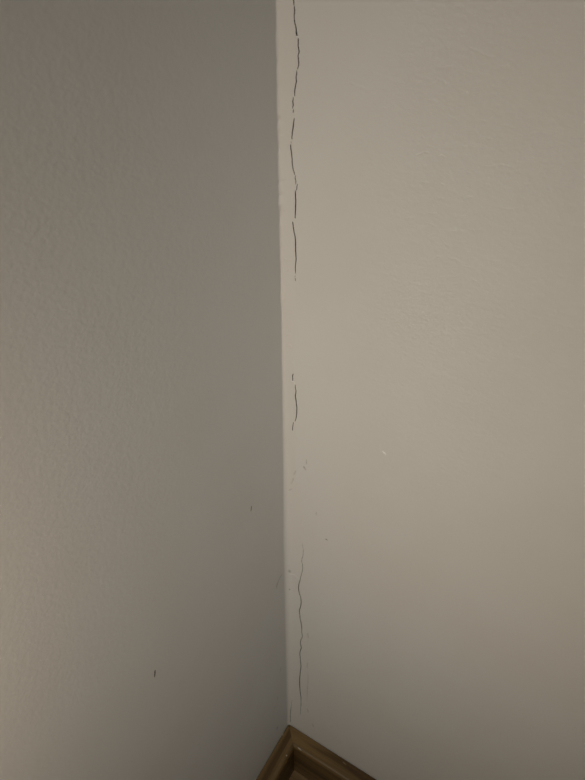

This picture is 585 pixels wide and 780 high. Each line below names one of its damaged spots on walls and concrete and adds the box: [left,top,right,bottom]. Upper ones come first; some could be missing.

crack [290,0,300,281]
crack [290,544,303,721]